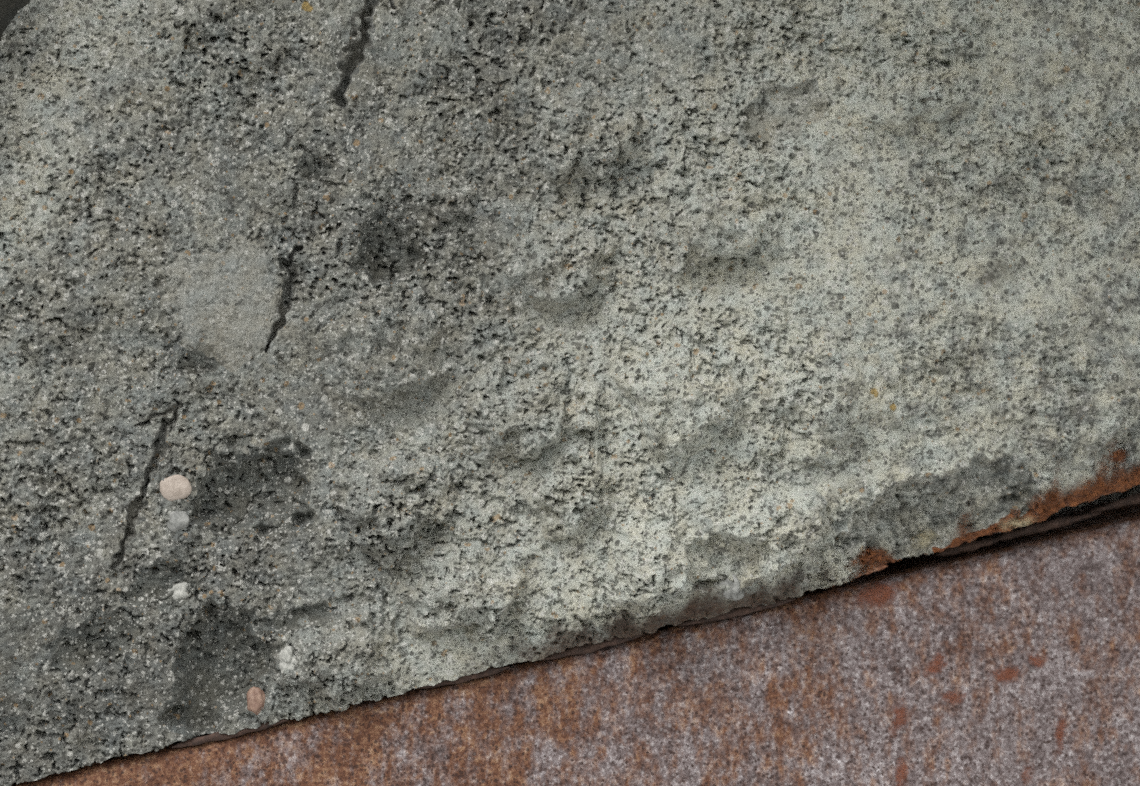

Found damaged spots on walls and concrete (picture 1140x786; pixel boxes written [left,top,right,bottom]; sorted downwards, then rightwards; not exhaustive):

crack [331,0,397,108]
crack [109,400,183,571]
rust [922,449,1140,555]
rust [851,548,901,575]
rust [532,583,800,660]